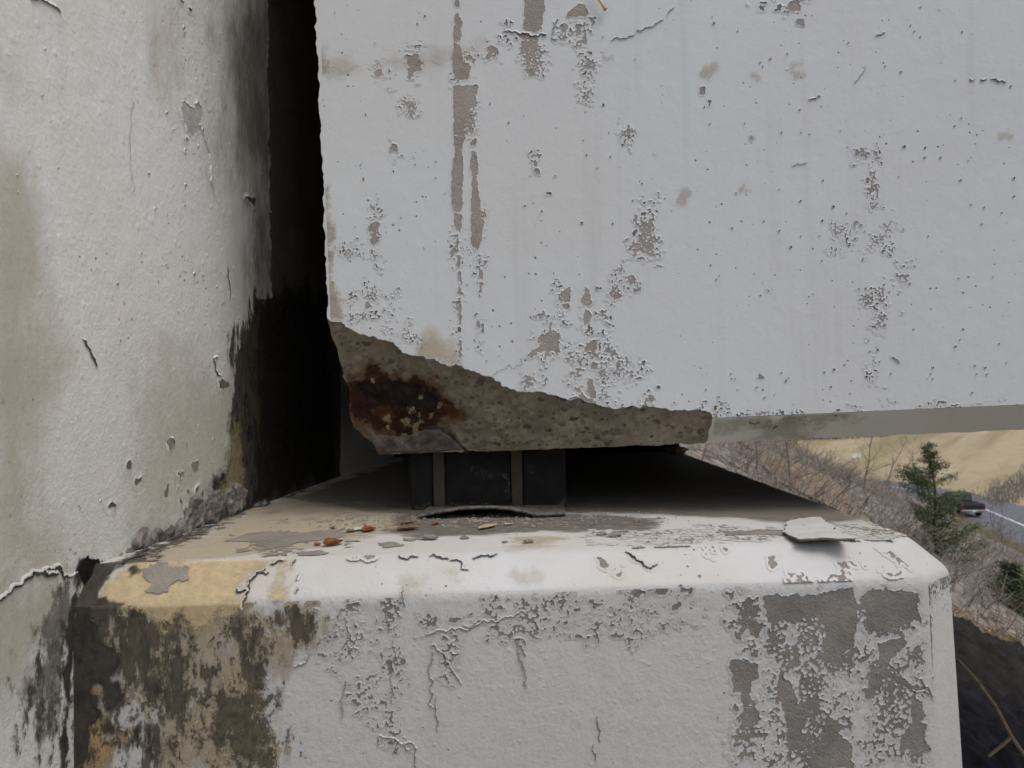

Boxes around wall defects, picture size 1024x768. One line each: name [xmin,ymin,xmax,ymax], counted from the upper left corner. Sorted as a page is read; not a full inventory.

spalling [119,0,812,562]
corrosion [347,364,466,436]
water stain [372,395,442,437]
crack [0,562,78,602]
peeling [99,487,119,516]
water stain [8,278,403,768]
crack [626,550,659,569]
crack [385,587,406,703]
crack [426,610,527,731]
peeling [103,521,953,768]